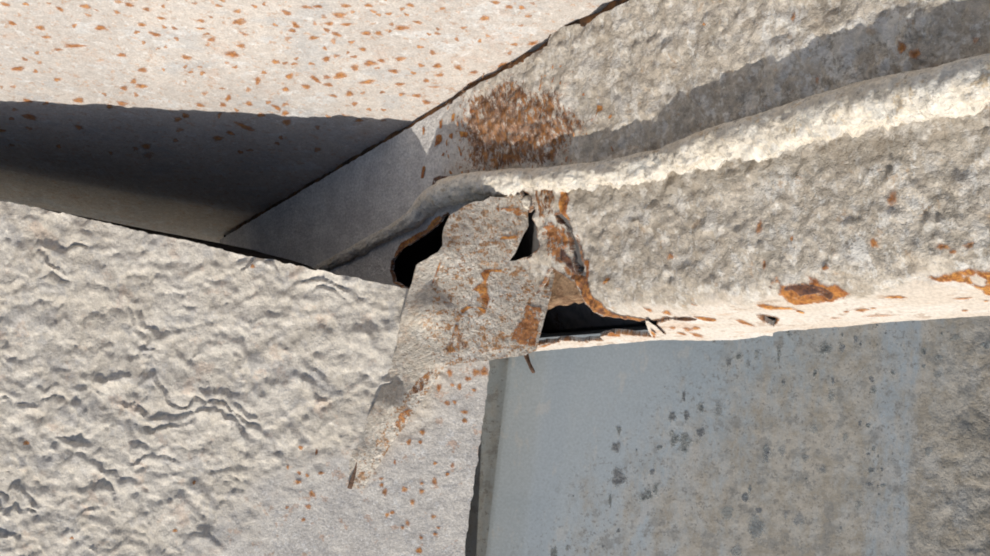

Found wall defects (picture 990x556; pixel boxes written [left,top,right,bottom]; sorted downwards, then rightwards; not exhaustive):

rust [114,0,179,49]
rust [225,9,247,69]
rust [302,3,443,122]
rust [434,65,612,174]
rust [757,265,848,314]
rust [930,269,990,302]
rust [395,366,488,428]
rust [402,463,454,505]